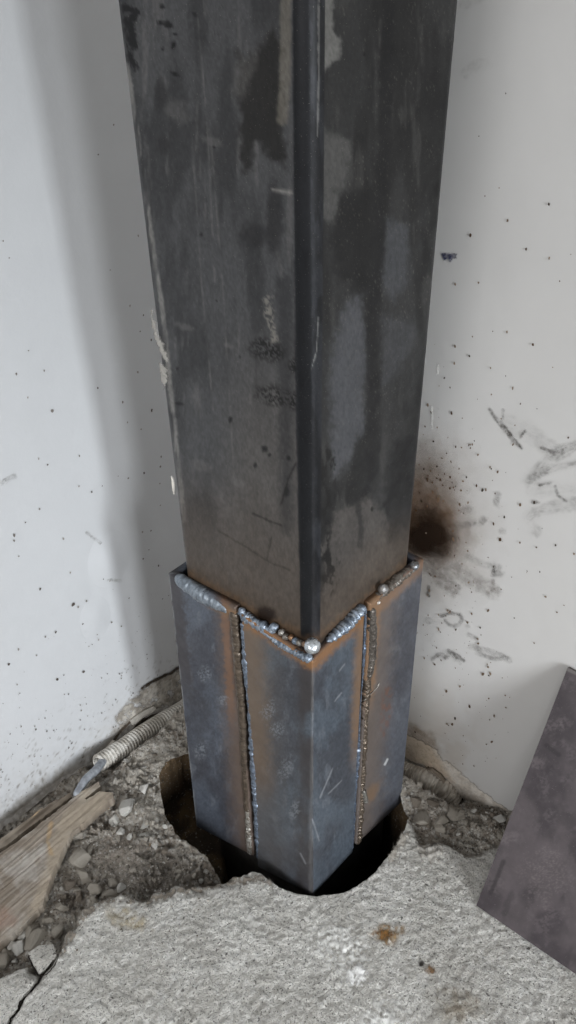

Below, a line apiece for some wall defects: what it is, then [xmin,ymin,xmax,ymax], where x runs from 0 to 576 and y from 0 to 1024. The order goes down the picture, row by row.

flaking render [107,666,182,747]
flaking render [405,735,509,812]
spalling [388,833,443,864]
spalling [60,875,273,956]
corrosion [373,925,403,945]
crack [9,950,59,1024]